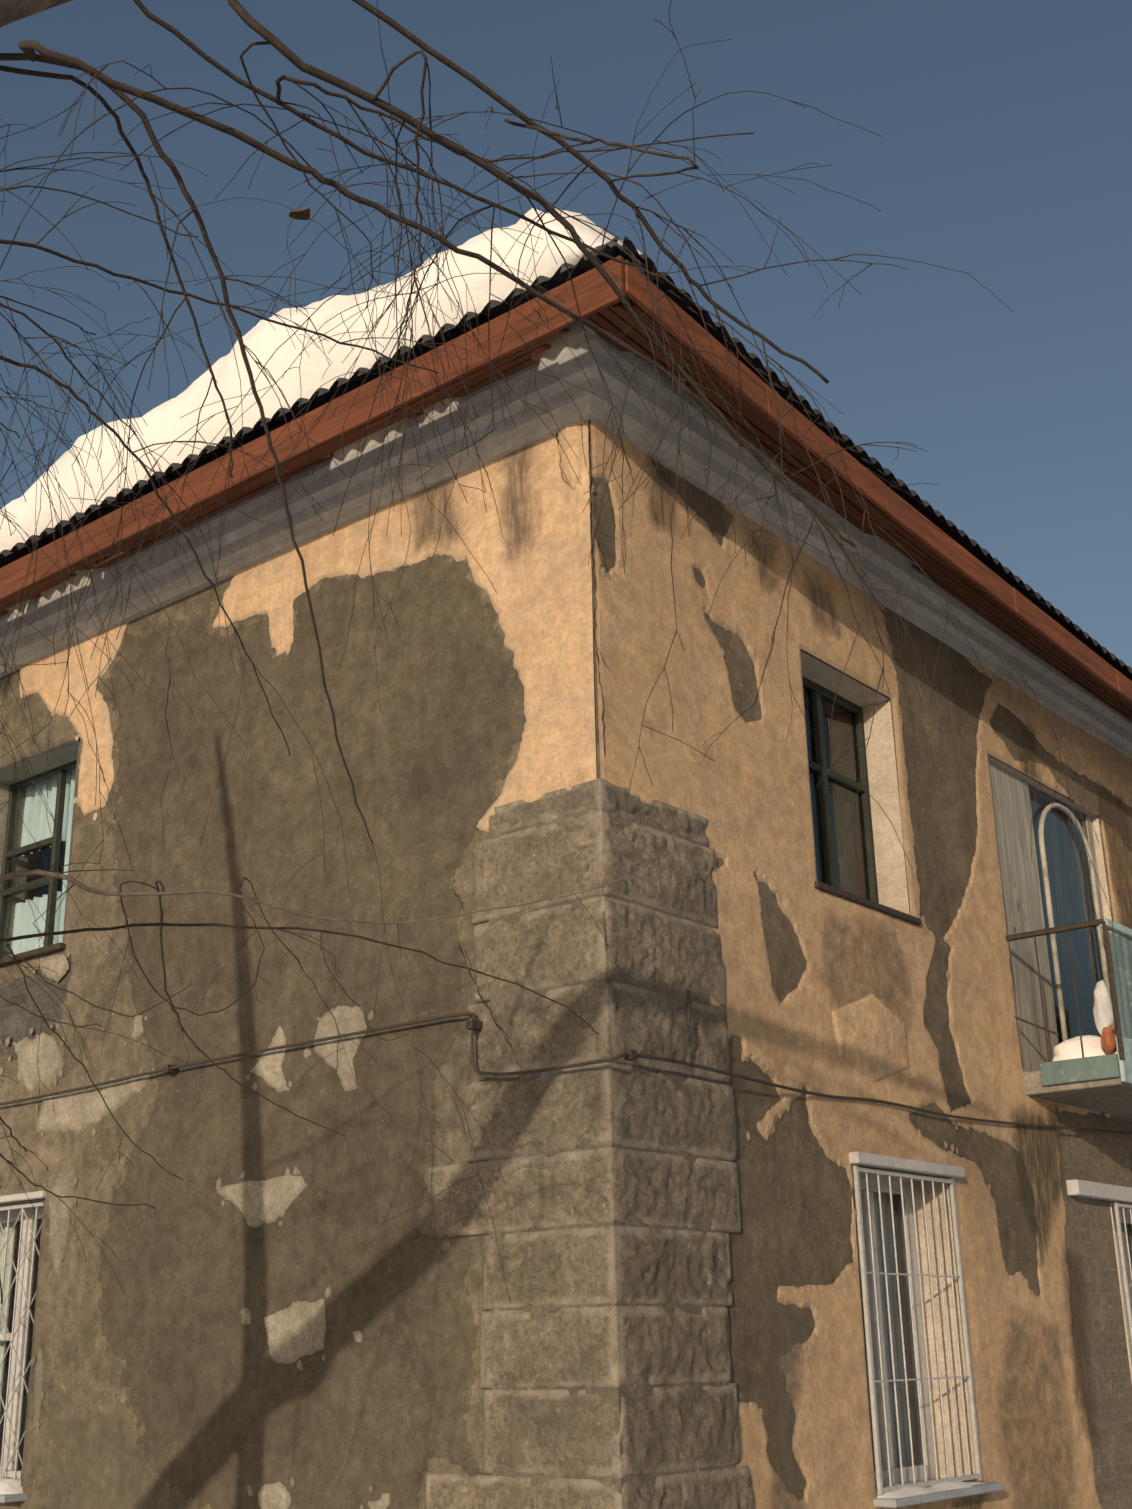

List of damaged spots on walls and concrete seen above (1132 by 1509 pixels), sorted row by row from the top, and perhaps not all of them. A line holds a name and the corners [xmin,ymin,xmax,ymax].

water stain [415,484,454,547]
water stain [507,447,527,552]
peeling [19,622,128,821]
flaking render [691,562,764,727]
flaking render [753,866,808,1003]
flaking render [885,607,1132,1296]
flaking render [0,953,156,1137]
peeling [303,1005,374,1092]
peeling [216,1166,307,1228]
peeling [240,1287,331,1371]
flaking render [722,1035,859,1500]
flaking render [1056,1111,1132,1509]